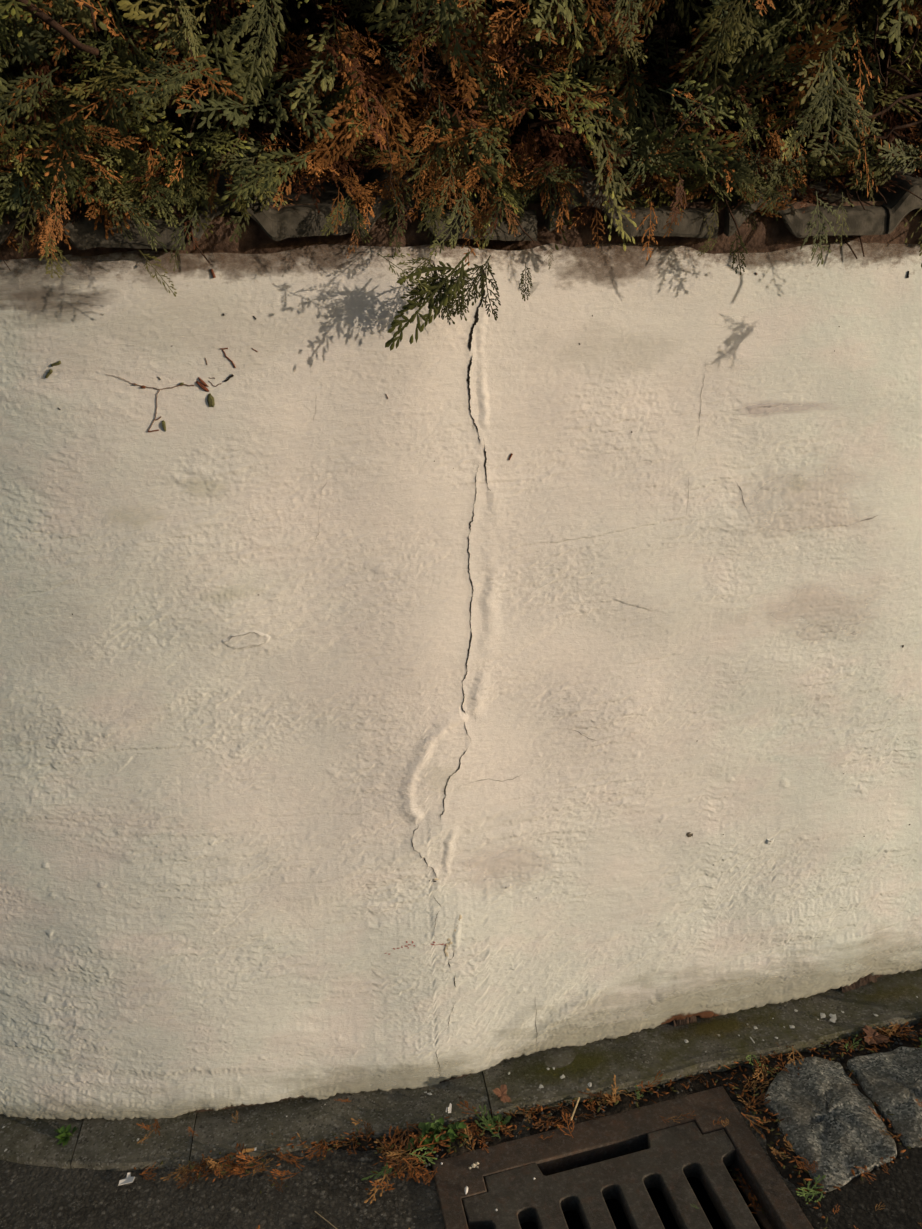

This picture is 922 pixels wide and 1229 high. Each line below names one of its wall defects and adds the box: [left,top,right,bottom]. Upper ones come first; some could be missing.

crack [412,265,523,1075]